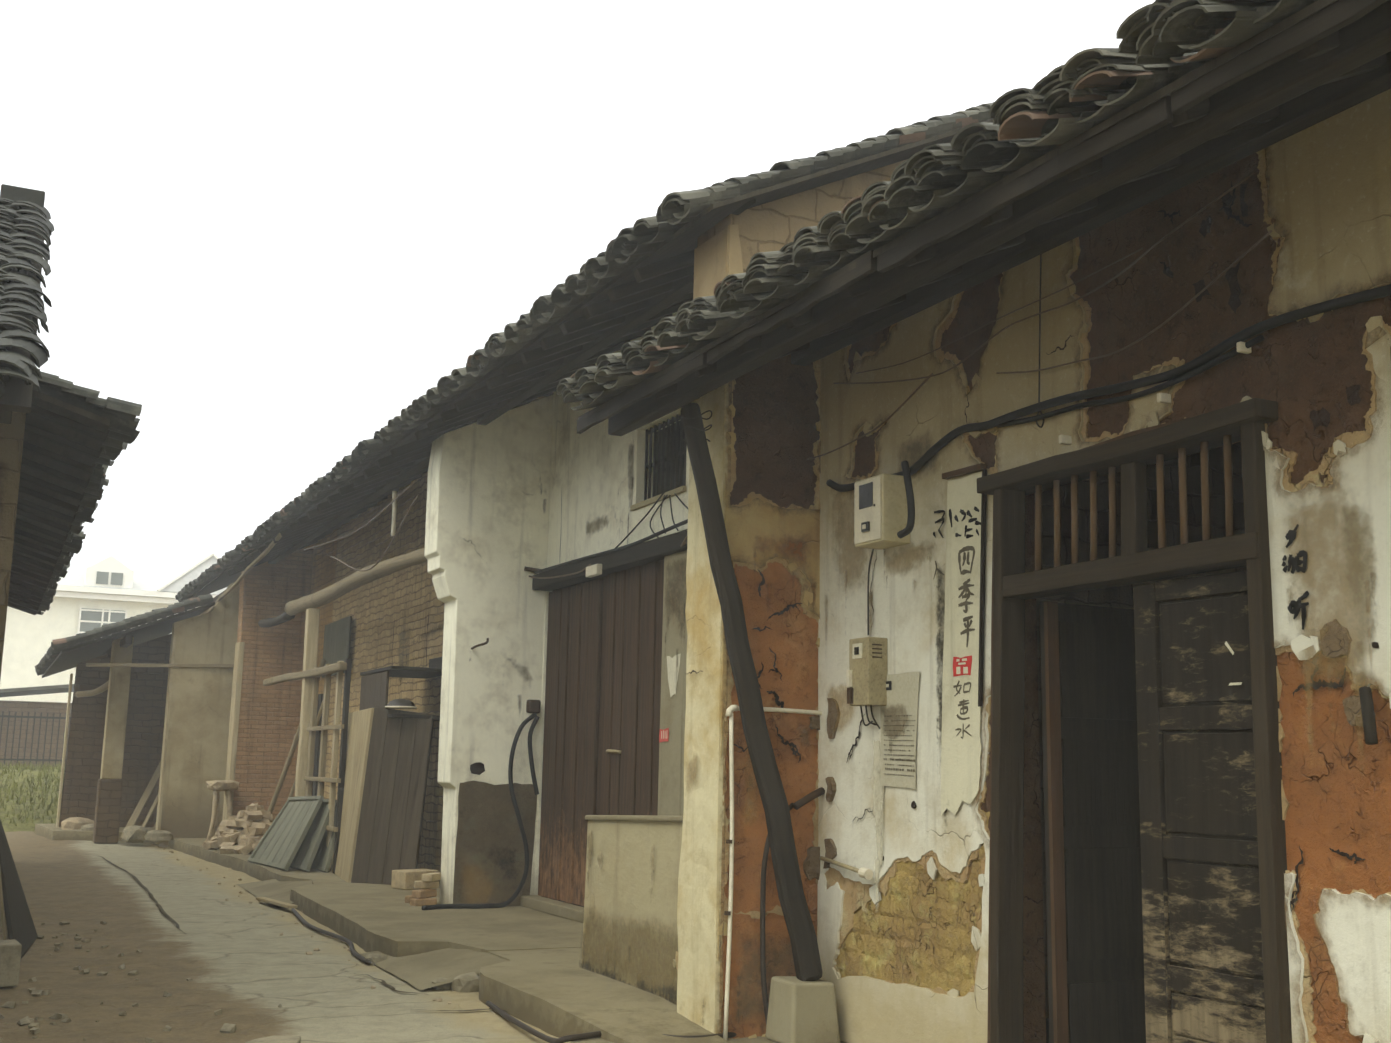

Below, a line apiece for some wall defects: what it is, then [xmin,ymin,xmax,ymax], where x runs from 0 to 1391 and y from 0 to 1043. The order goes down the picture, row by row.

spalling [1065,237,1130,442]
spalling [1261,316,1391,492]
crack [734,570,802,763]
damp [1291,503,1372,697]
spalling [1275,635,1391,820]
spalling [717,650,734,1019]
peeling [869,884,882,904]
peeling [927,857,937,880]
peeling [971,926,981,951]
spalling [1285,870,1317,1043]
crack [1290,846,1365,911]
peeling [1348,1020,1380,1043]